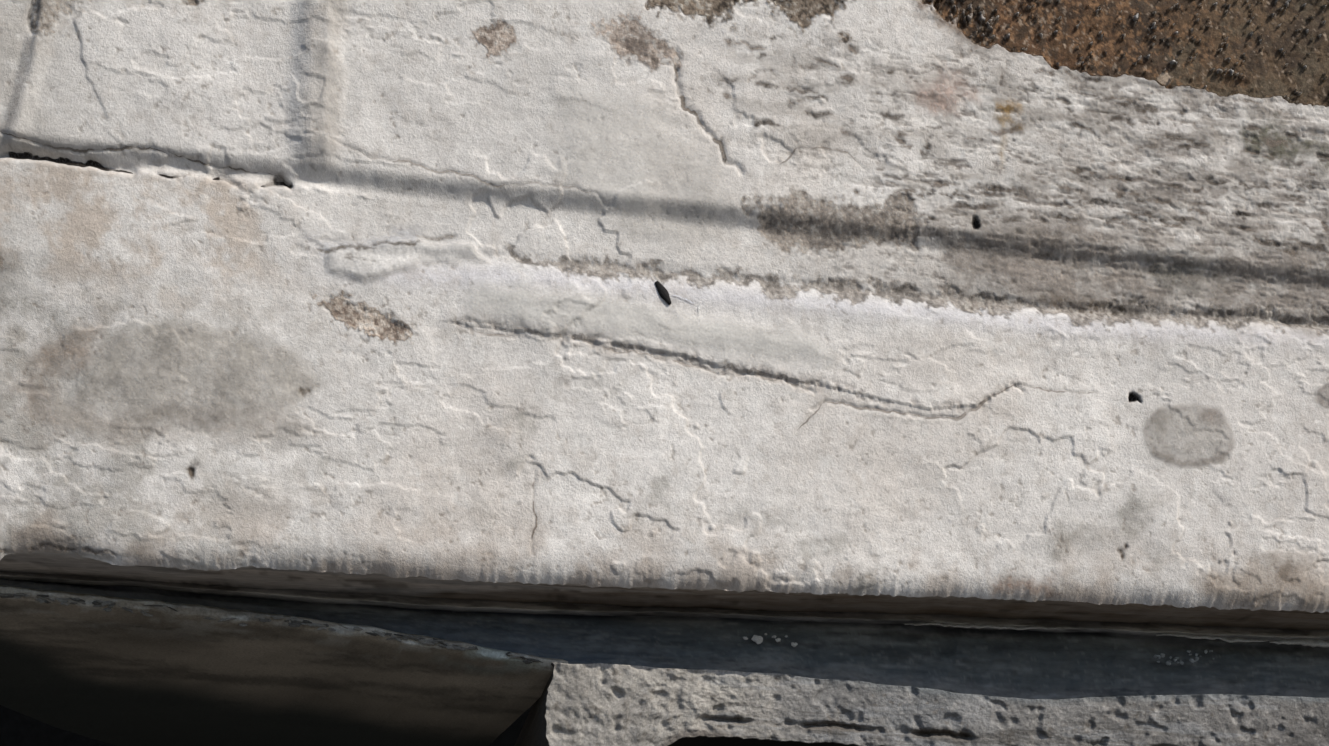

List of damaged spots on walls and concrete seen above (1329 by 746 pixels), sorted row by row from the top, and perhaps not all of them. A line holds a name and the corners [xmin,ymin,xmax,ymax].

crack [0,131,291,189]
spalling [473,20,516,57]
crack [654,52,727,163]
spalling [591,0,857,70]
peeling [757,69,831,118]
peeling [882,114,930,156]
spalling [922,0,1329,133]
water stain [1243,127,1329,164]
spalling [507,155,1329,335]
spalling [312,290,413,343]
water stain [80,325,309,415]
crack [453,319,1094,427]